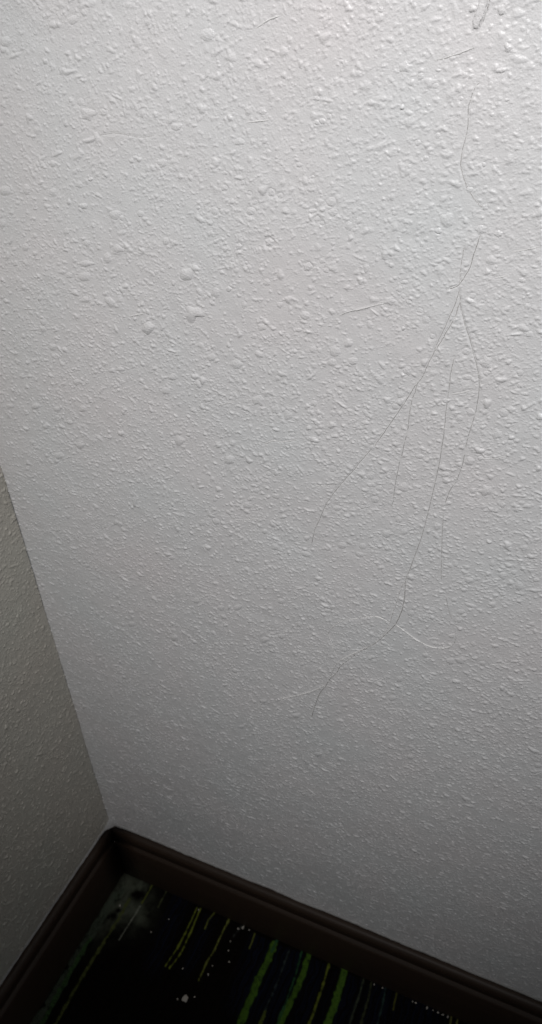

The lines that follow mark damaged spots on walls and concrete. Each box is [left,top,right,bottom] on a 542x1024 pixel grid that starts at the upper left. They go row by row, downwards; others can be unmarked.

crack [281,83,486,717]